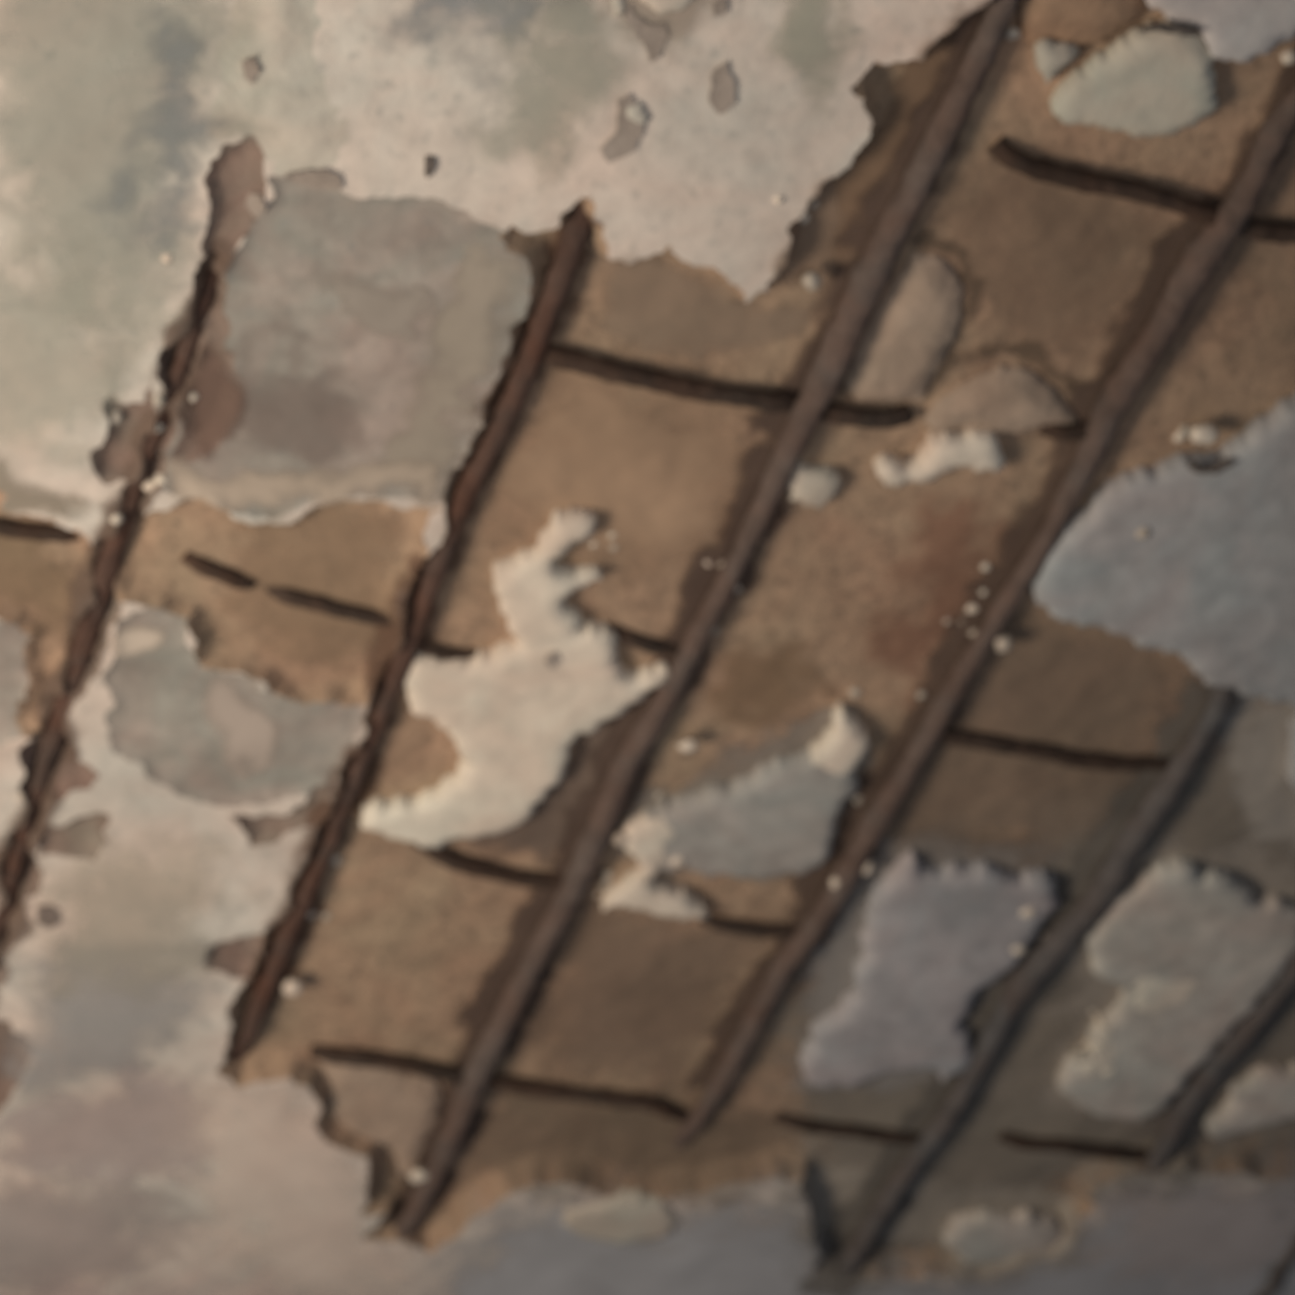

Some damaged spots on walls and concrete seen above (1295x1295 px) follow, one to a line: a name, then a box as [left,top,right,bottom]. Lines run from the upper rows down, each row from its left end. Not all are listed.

water stain [0,465,77,514]
water stain [0,947,201,1290]
rust [0,349,244,958]
rust [164,243,231,360]
rust [245,557,436,1009]
rust [374,687,659,1232]
spalling [0,0,1060,1253]
rust [655,1,991,669]
rust [688,440,1081,1087]
spalling [493,0,1295,1281]
rust [1069,218,1205,424]
water stain [1141,742,1295,889]